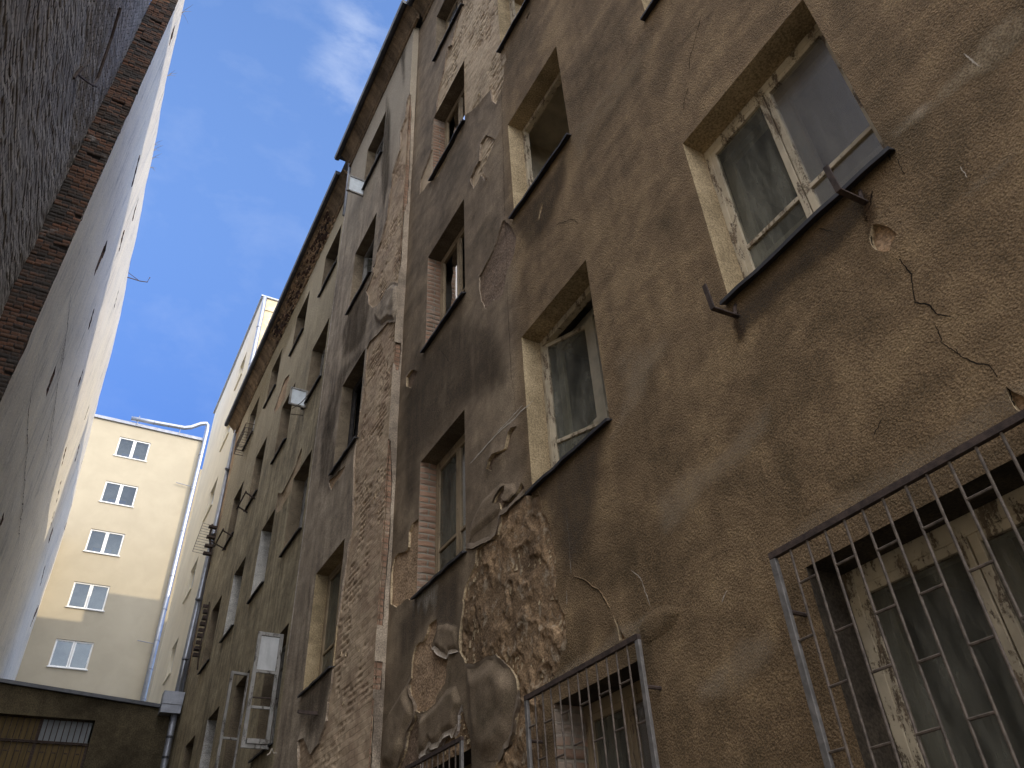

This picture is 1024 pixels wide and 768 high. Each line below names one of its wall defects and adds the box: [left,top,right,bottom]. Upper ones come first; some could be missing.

spalling [366,0,506,308]
spalling [869,224,897,252]
crack [899,259,1015,406]
spalling [1006,387,1024,411]
spalling [297,322,567,768]